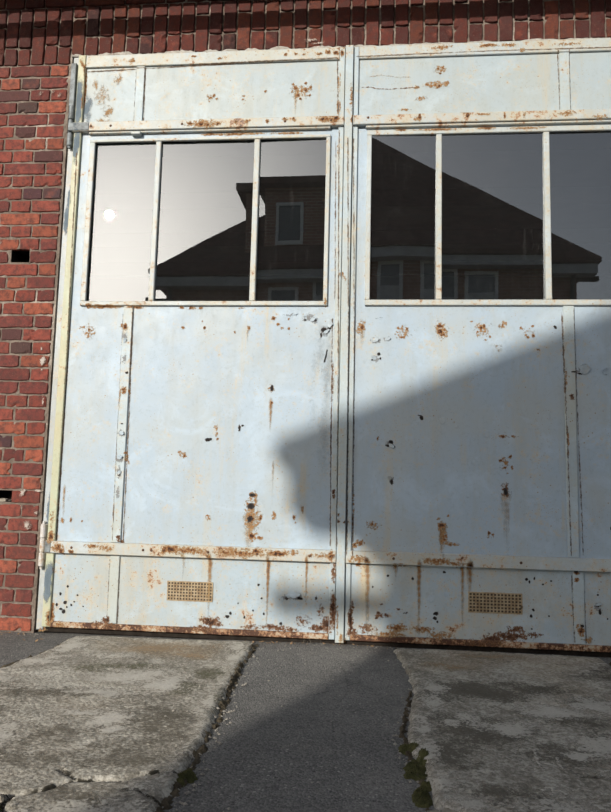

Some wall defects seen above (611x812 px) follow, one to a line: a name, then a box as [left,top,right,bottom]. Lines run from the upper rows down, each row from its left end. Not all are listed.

rust [290,82,312,103]
rust [316,66,449,123]
rust [186,119,304,136]
rust [396,108,459,131]
rust [435,323,448,338]
rust [160,491,544,670]
rust [38,603,65,632]
rust [91,616,120,629]
crack [0,770,94,812]
crack [120,770,178,805]